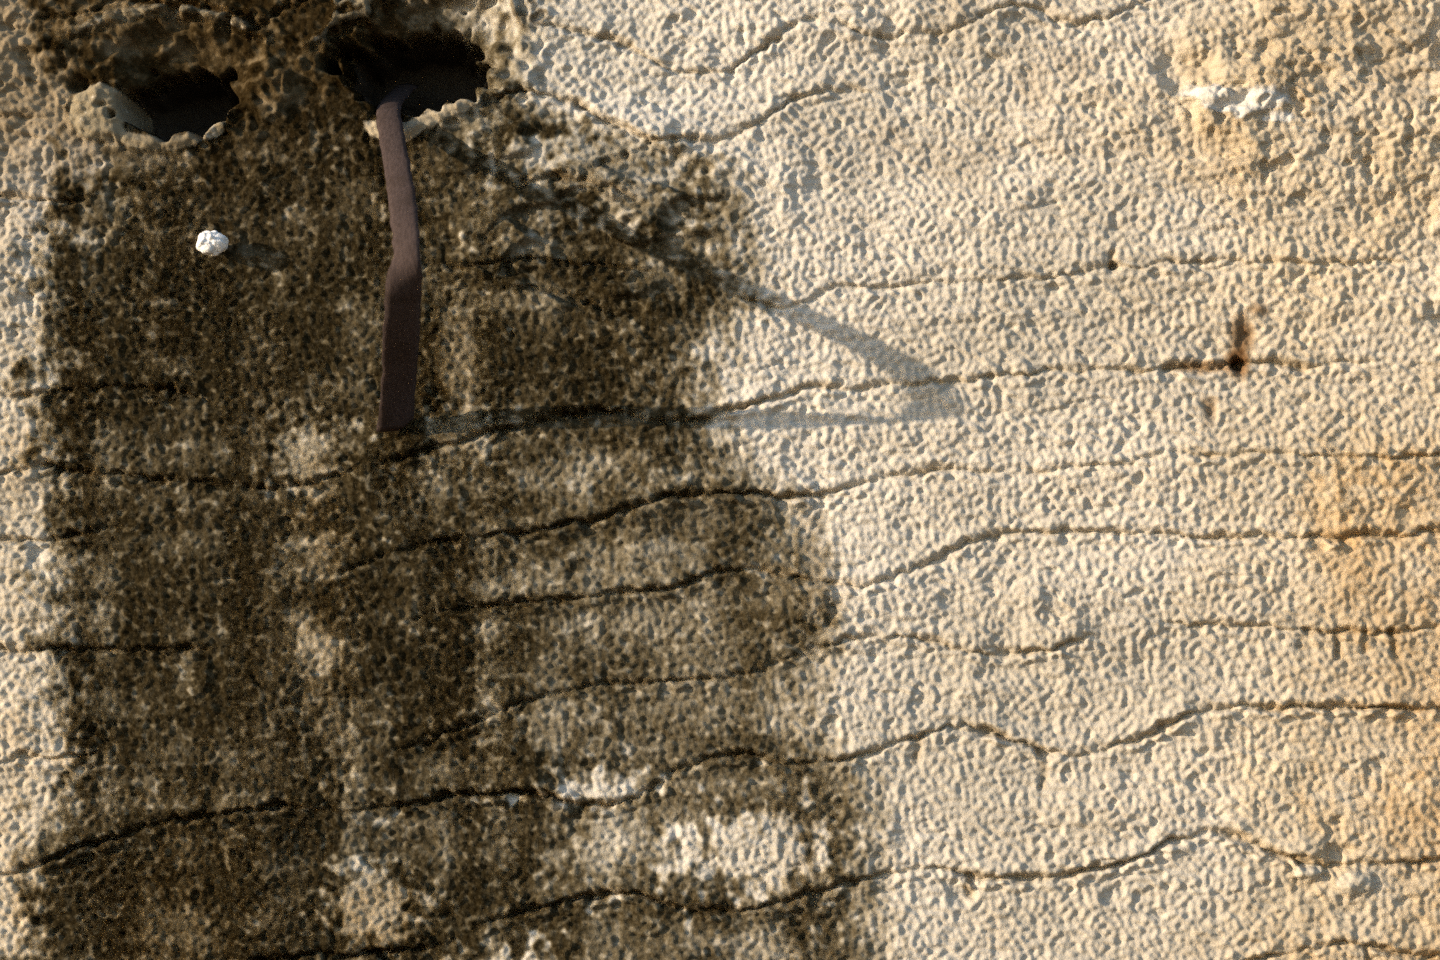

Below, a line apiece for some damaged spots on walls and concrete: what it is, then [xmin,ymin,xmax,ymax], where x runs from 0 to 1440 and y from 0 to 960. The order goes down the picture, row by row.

spalling [78,4,161,28]
spalling [180,5,247,28]
spalling [315,0,371,40]
spalling [510,0,548,25]
spalling [69,78,240,151]
spalling [334,44,488,141]
corrosion [1229,326,1247,373]
water stain [2,0,873,960]